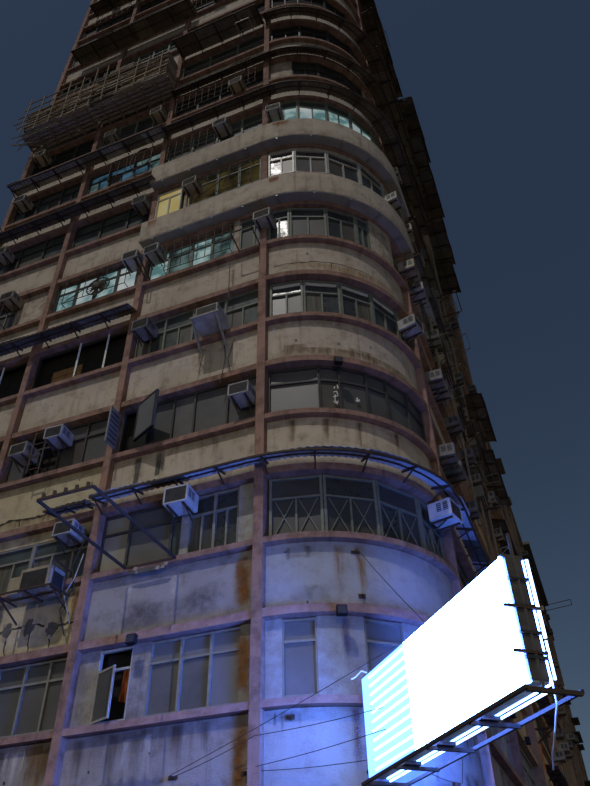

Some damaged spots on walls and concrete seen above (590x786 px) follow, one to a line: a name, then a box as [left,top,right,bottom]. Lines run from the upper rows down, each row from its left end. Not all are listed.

peeling [0,606,59,642]